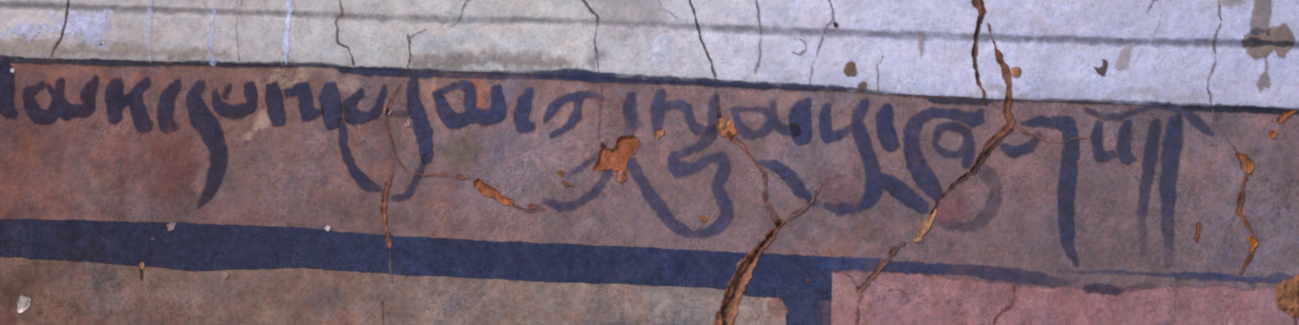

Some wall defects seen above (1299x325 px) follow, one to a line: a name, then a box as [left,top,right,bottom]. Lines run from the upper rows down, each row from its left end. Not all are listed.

crack [335,0,354,65]
spalling [473,178,538,209]
spalling [593,129,664,184]
crack [689,0,845,325]
crack [844,0,1087,325]
crack [1207,3,1258,275]
peeling [17,295,31,313]
spalling [1275,274,1299,318]